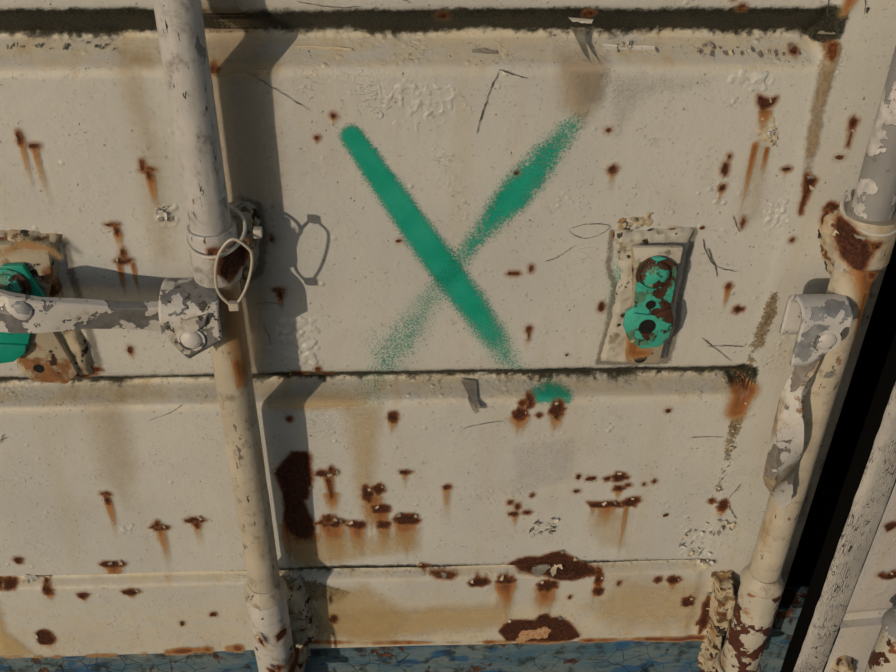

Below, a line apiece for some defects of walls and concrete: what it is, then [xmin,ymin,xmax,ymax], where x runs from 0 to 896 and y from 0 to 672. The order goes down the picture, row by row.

rust [756,95,778,127]
rust [15,129,43,175]
rust [745,142,770,191]
rust [798,173,818,216]
rust [104,222,138,287]
rust [820,201,883,354]
rust [510,391,566,430]
rust [270,451,421,565]
rust [573,472,657,536]
rust [0,576,18,591]
rust [418,563,457,580]
rust [467,551,712,644]